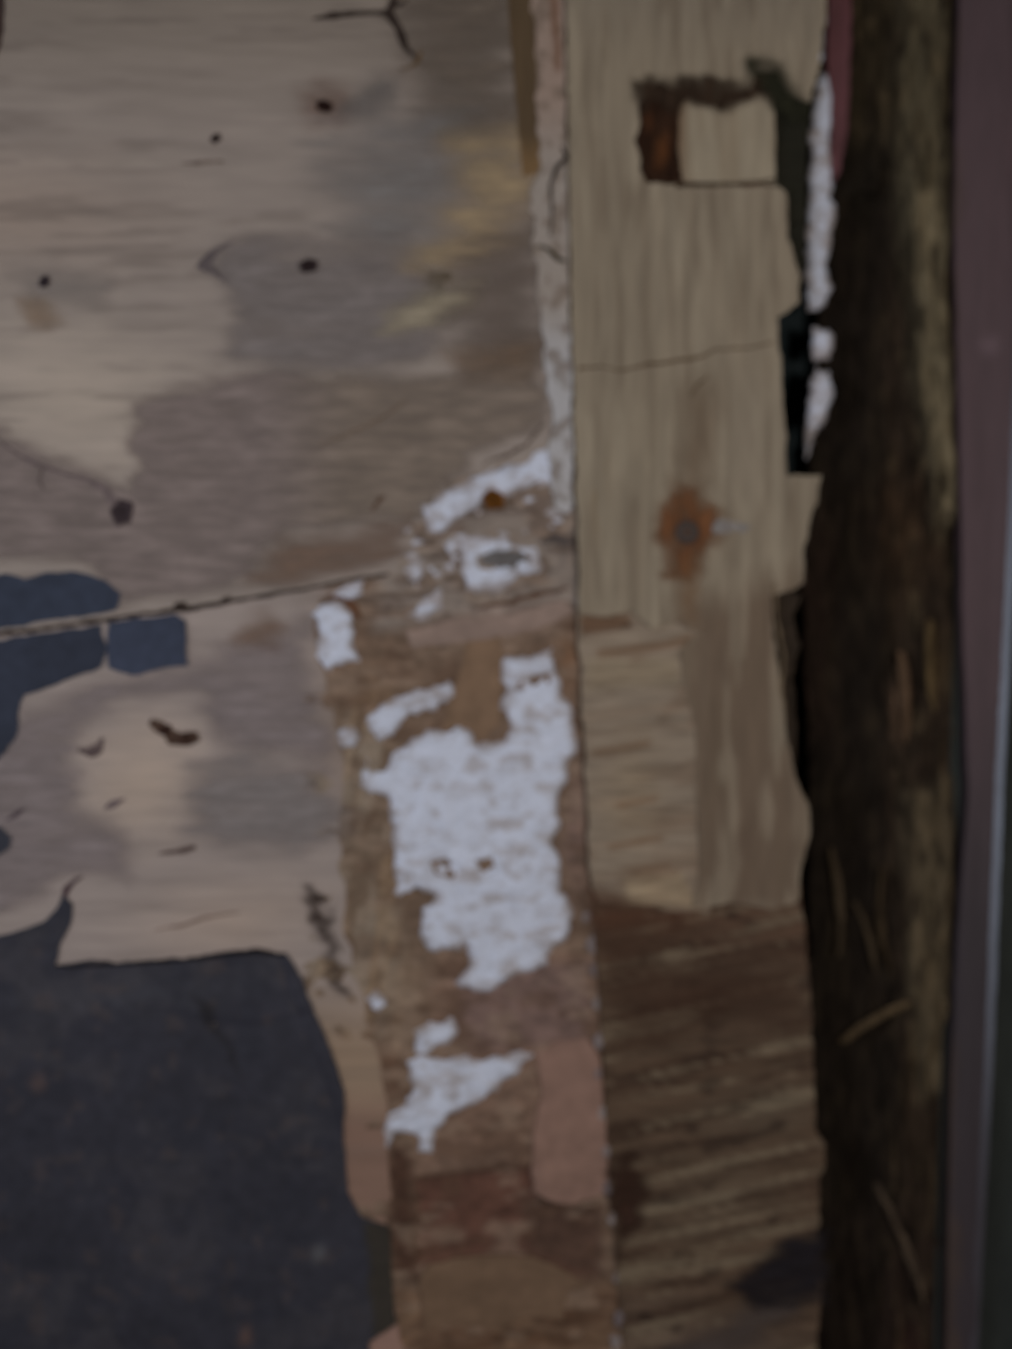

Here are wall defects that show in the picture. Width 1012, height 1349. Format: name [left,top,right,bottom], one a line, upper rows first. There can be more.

crack [313,0,422,70]
peeling [403,527,468,581]
corrosion [482,489,505,509]
corrosion [656,488,719,580]
crack [0,573,389,636]
peeling [0,571,189,758]
peeling [367,600,573,741]
peeling [149,719,200,746]
peeling [0,808,26,854]
peeling [414,1017,458,1054]
peeling [0,894,398,1349]
peeling [530,1039,608,1204]